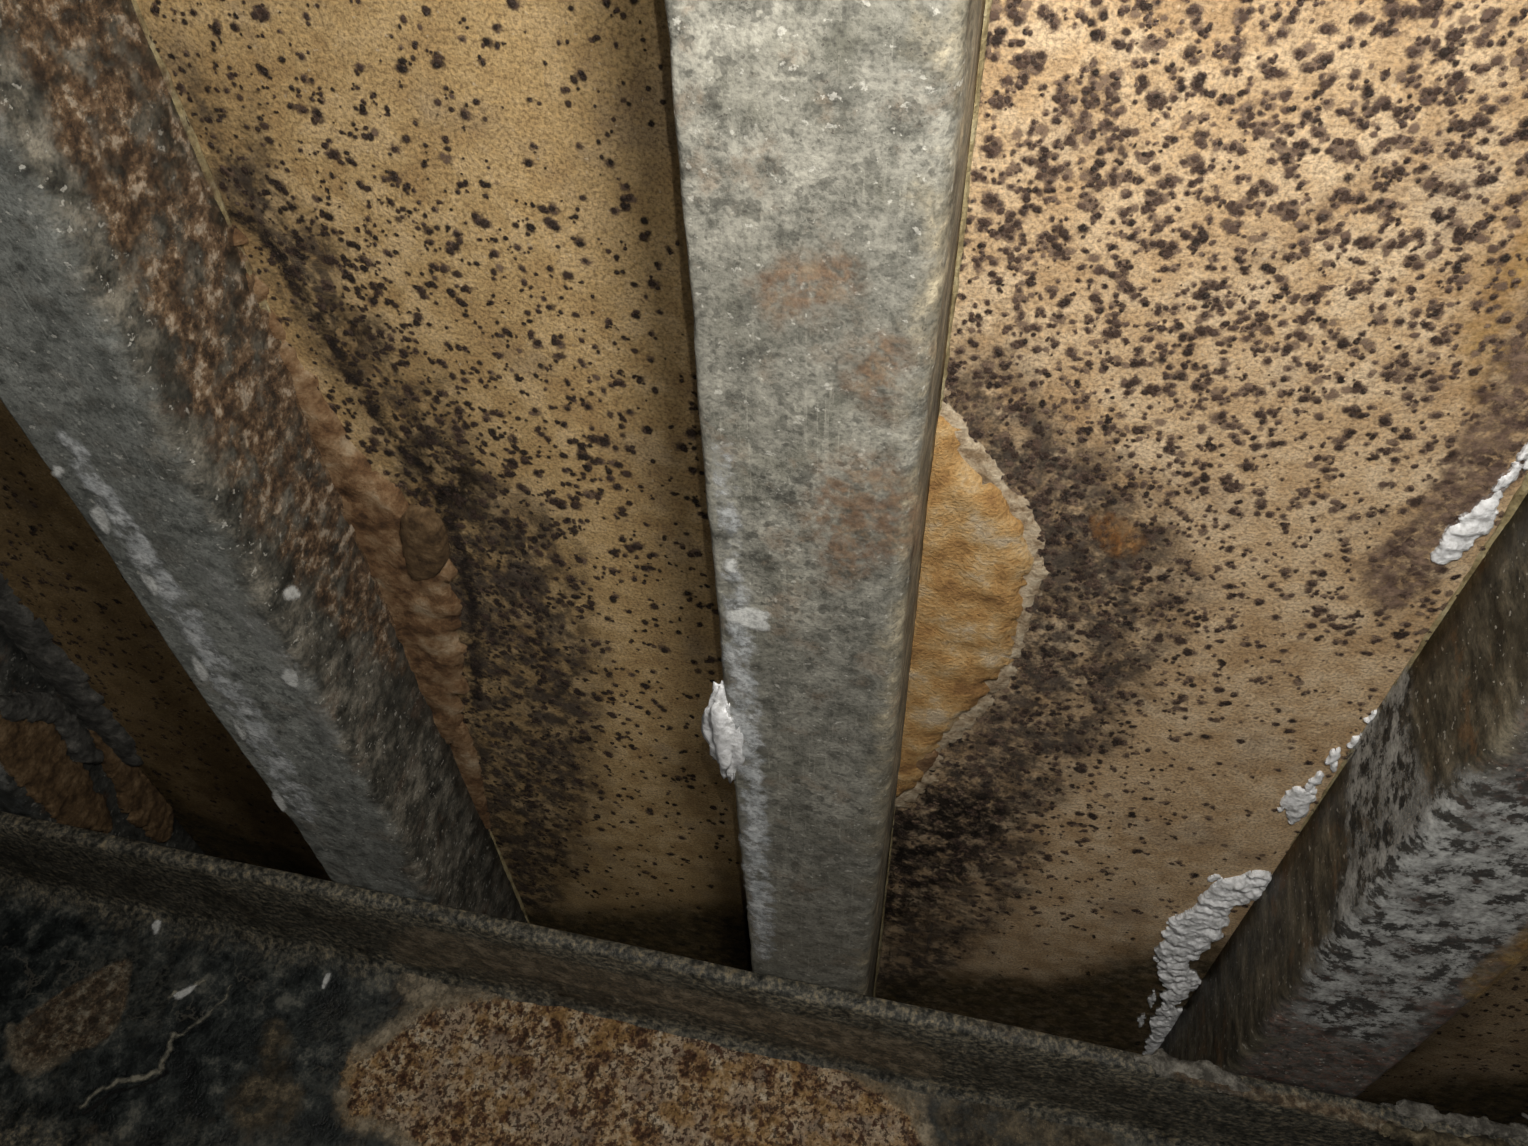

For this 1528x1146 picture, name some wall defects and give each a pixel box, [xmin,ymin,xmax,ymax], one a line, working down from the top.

leakage [0,432,323,877]
leakage [149,0,776,971]
peeling [894,388,1050,809]
leakage [1363,966,1528,1127]